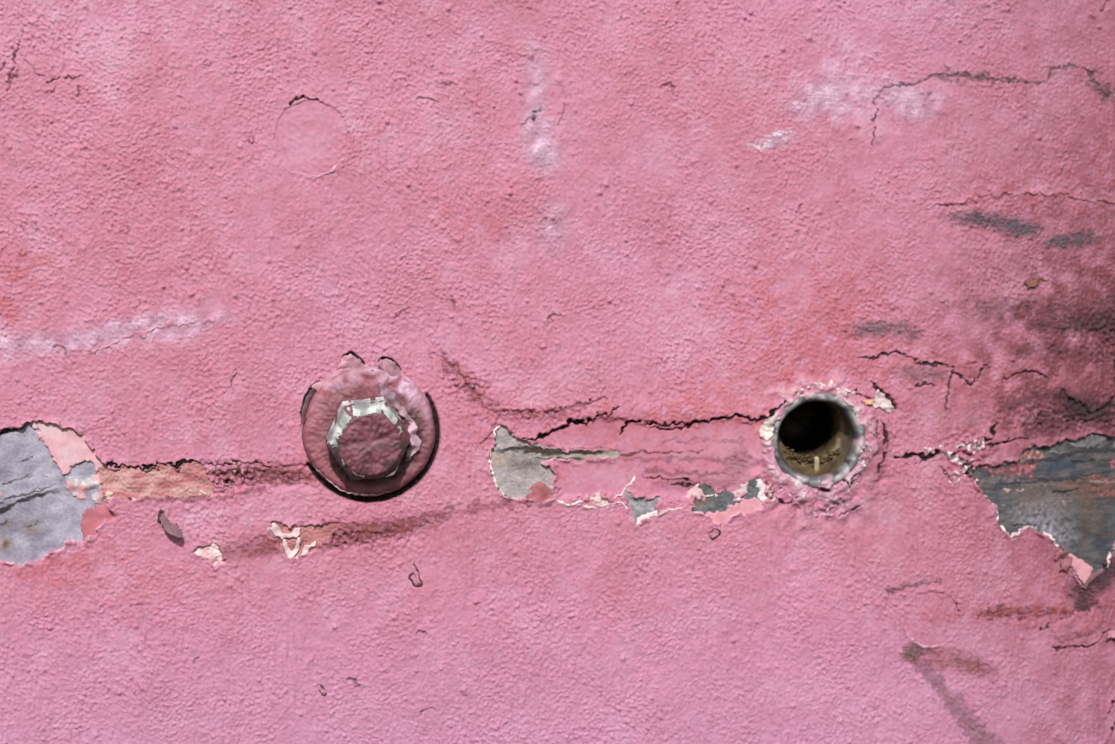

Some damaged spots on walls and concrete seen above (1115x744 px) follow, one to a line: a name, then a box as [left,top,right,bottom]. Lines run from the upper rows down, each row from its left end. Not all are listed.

crack [871,65,1115,146]
peeling [0,420,246,565]
corrosion [224,467,310,486]
crack [429,354,786,444]
crack [642,475,699,487]
peeling [488,425,871,526]
peeling [759,419,775,442]
crack [765,351,1115,520]
peeling [922,433,1115,590]